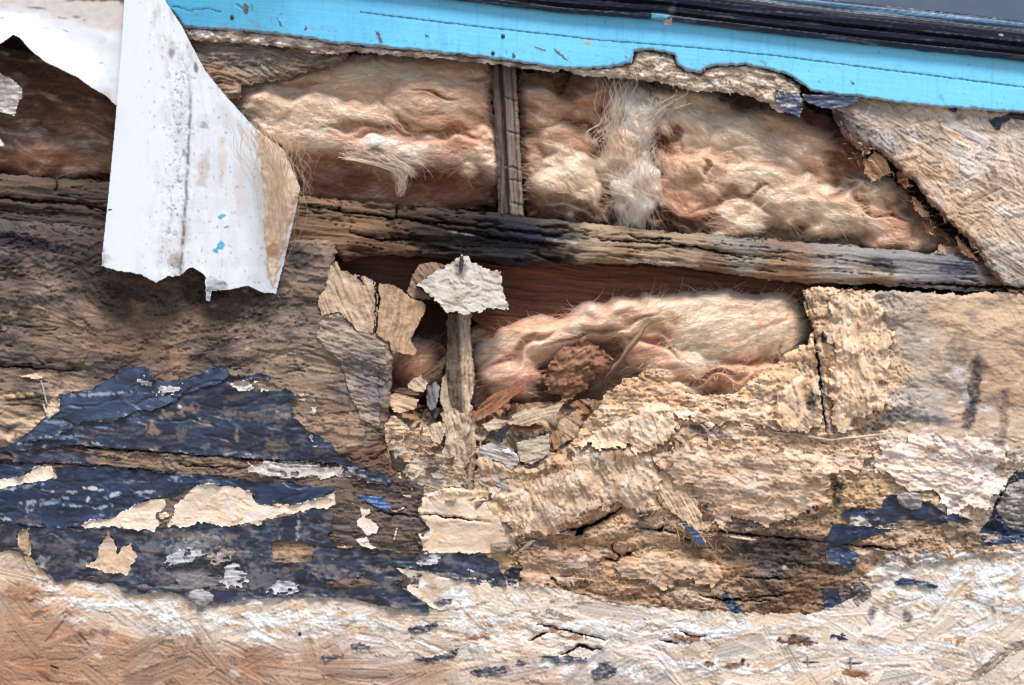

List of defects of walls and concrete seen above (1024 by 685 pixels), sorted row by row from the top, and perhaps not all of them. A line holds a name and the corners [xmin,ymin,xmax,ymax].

spalling [183,17,978,261]
peeling [0,465,58,489]
peeling [46,393,60,418]
peeling [61,261,1024,681]
crack [805,299,827,432]
peeling [17,528,48,584]